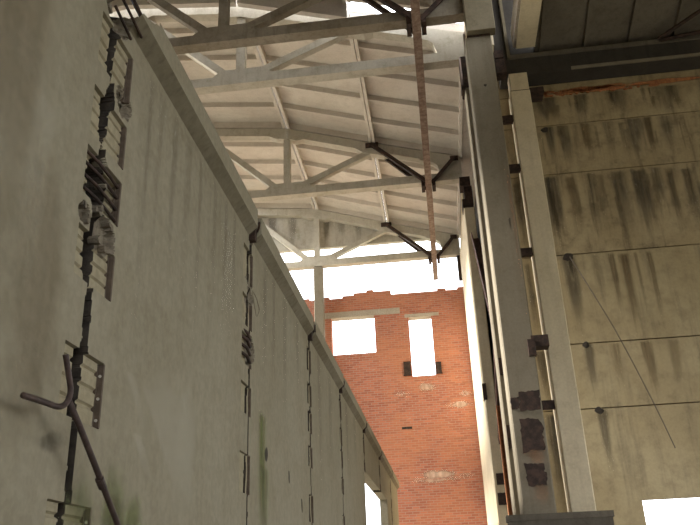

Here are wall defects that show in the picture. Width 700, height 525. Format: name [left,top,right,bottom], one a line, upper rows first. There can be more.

spalling [107,0,143,40]
rust [544,77,700,97]
spalling [78,149,119,259]
water stain [545,178,562,216]
crack [54,17,121,525]
crack [245,245,260,337]
crack [242,369,250,525]
crack [301,325,316,525]
water stain [548,416,559,462]